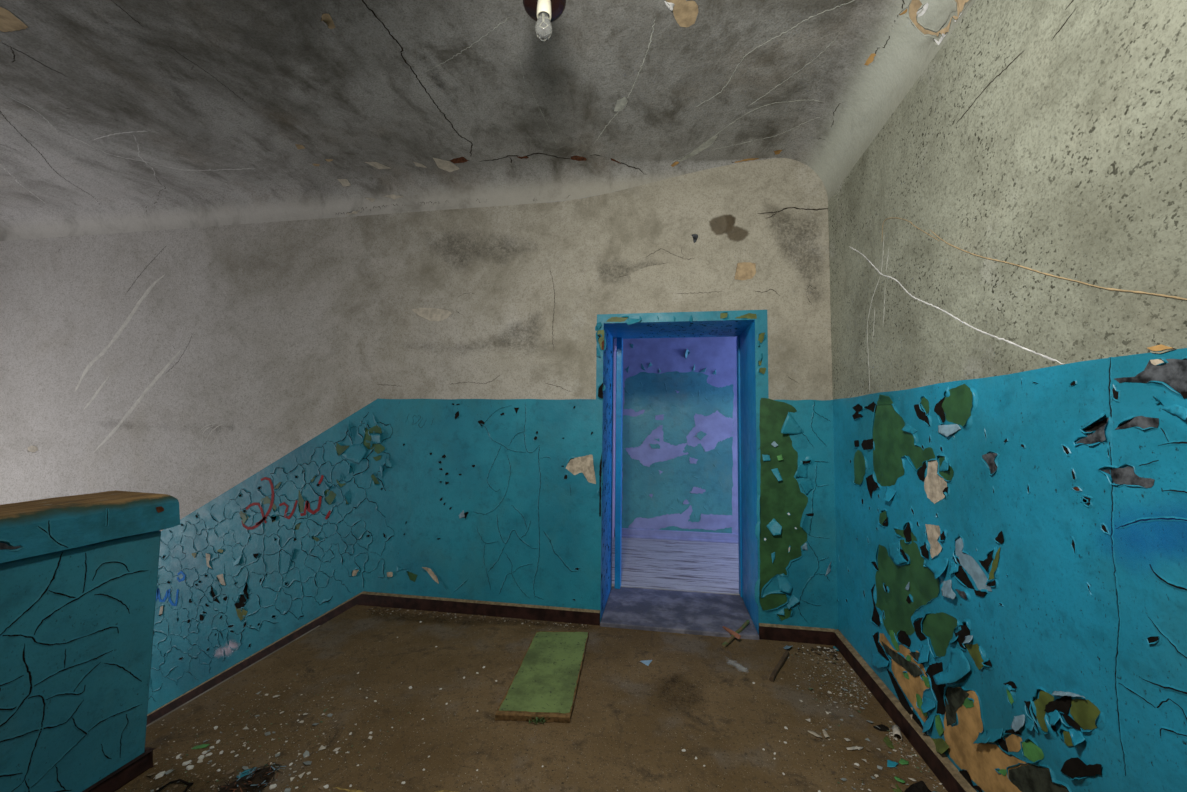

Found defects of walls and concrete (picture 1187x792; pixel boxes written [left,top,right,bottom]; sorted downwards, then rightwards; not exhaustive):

crack [361,0,855,175]
leakage [710,215,747,241]
crack [849,246,1062,364]
crack [0,412,395,792]
peeling [177,548,277,652]
peeling [283,414,393,588]
peeling [387,566,447,589]
peeling [561,312,757,609]
peeling [755,398,815,622]
peeling [849,384,1106,792]
crack [1107,357,1187,777]
peeling [1146,635,1162,647]